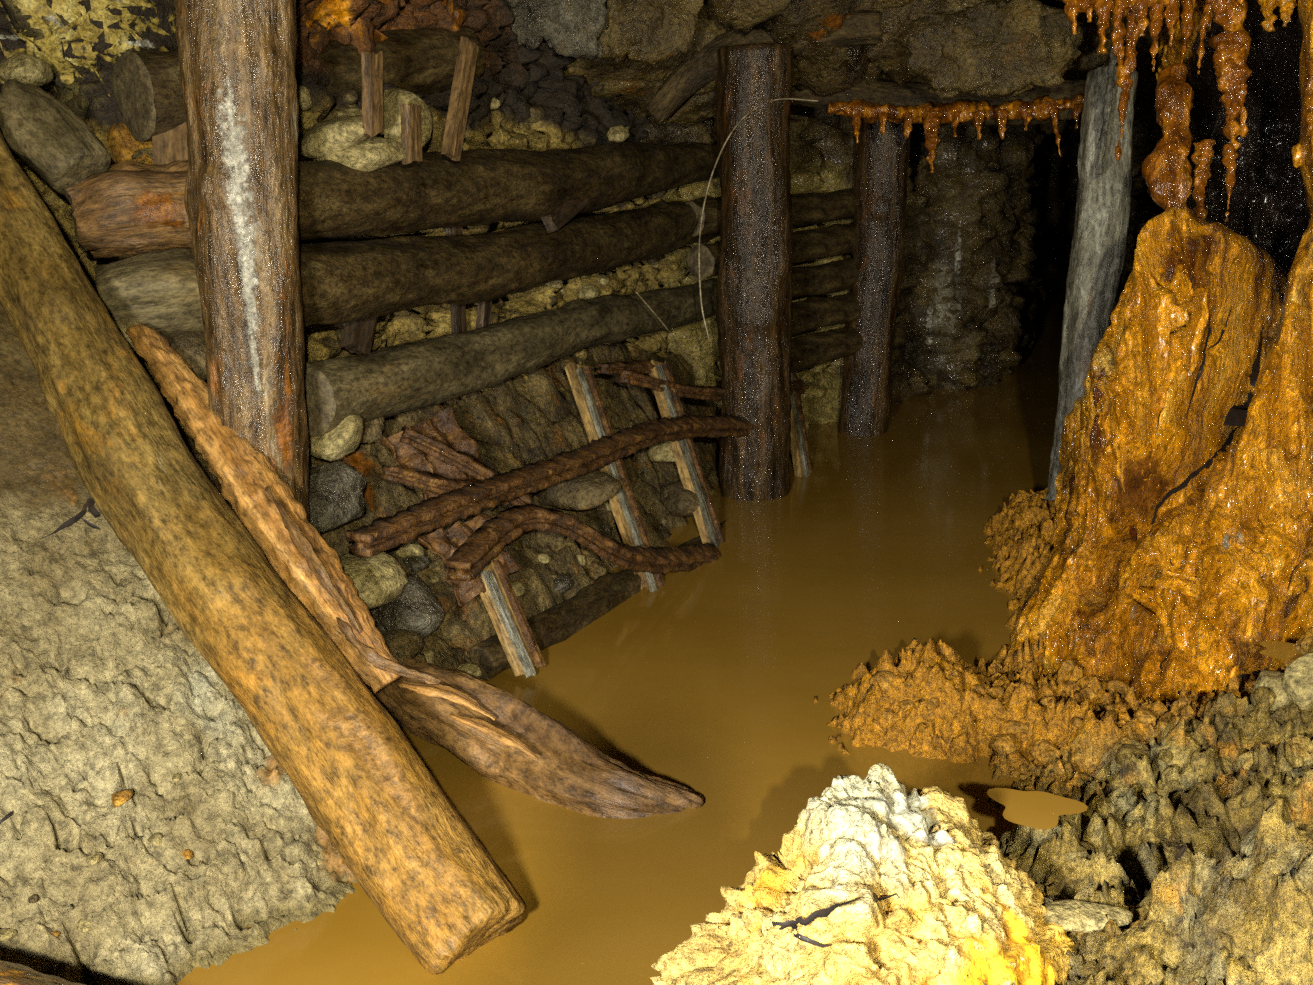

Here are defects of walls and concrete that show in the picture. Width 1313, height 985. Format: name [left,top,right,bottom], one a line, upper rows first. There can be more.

efflorescence [216,78,262,405]
corrosion [826,93,1084,174]
corrosion [1063,0,1298,222]